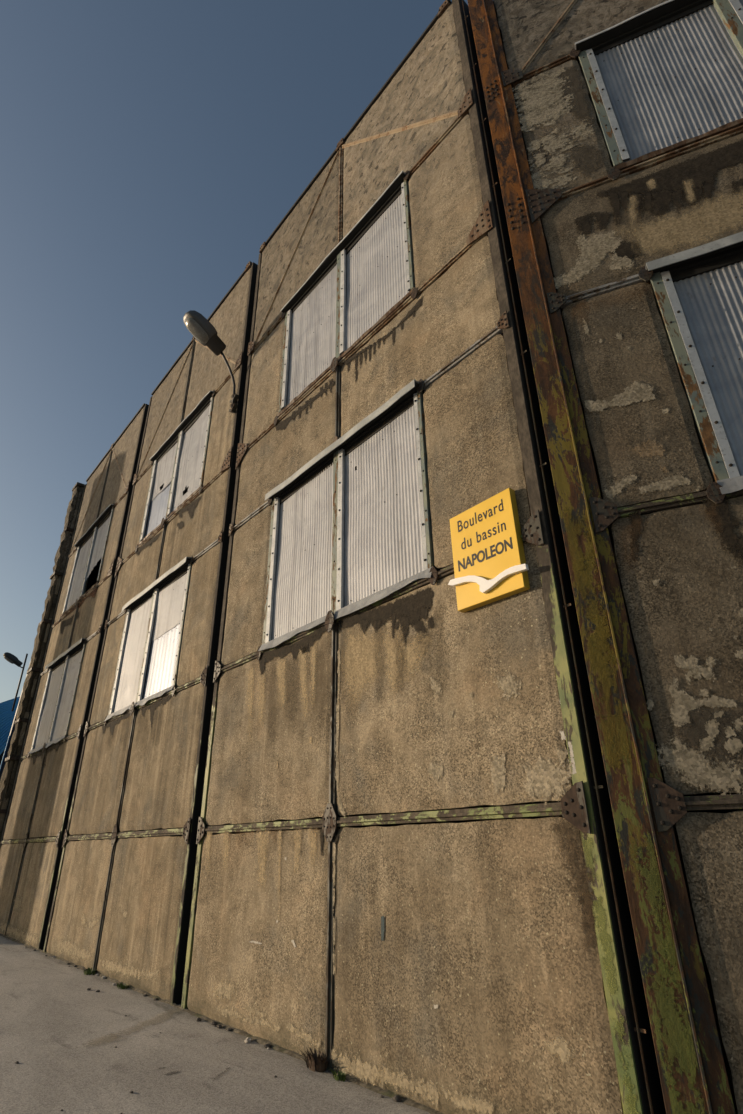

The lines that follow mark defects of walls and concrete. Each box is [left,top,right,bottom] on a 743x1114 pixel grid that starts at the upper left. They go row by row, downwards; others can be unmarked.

spalling [512,67,595,189]
spalling [554,230,634,288]
spalling [585,381,670,414]
water stain [248,586,434,731]
spalling [656,654,743,795]
rust [550,814,598,955]